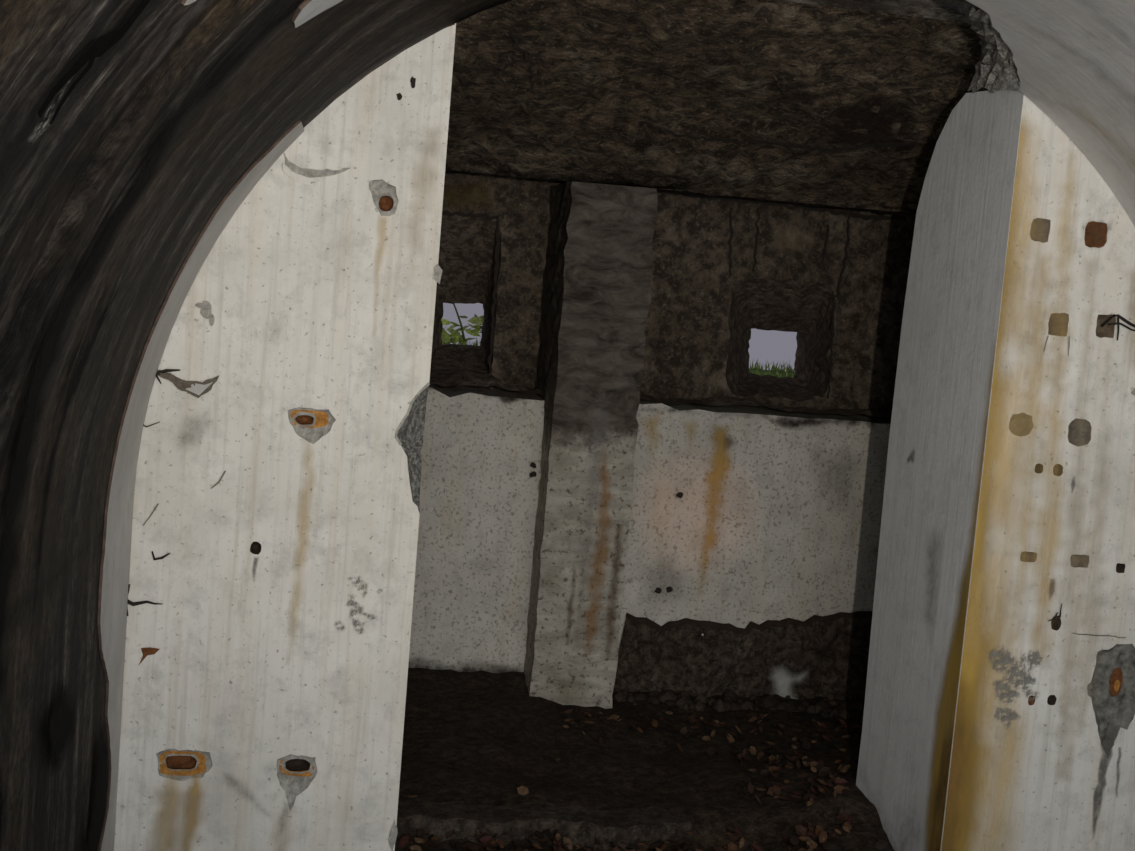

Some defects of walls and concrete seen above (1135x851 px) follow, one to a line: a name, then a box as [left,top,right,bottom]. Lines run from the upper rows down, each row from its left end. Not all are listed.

peeling [292,0,343,28]
peeling [962,0,1135,226]
spalling [369,179,399,216]
peeling [98,120,350,851]
spalling [397,386,429,514]
corrosion [706,430,728,550]
corrosion [927,174,1017,851]
flaking render [336,577,379,633]
flaking render [612,611,873,701]
flaking render [989,649,1042,726]
spalling [1087,644,1135,752]
corrosion [159,751,207,850]